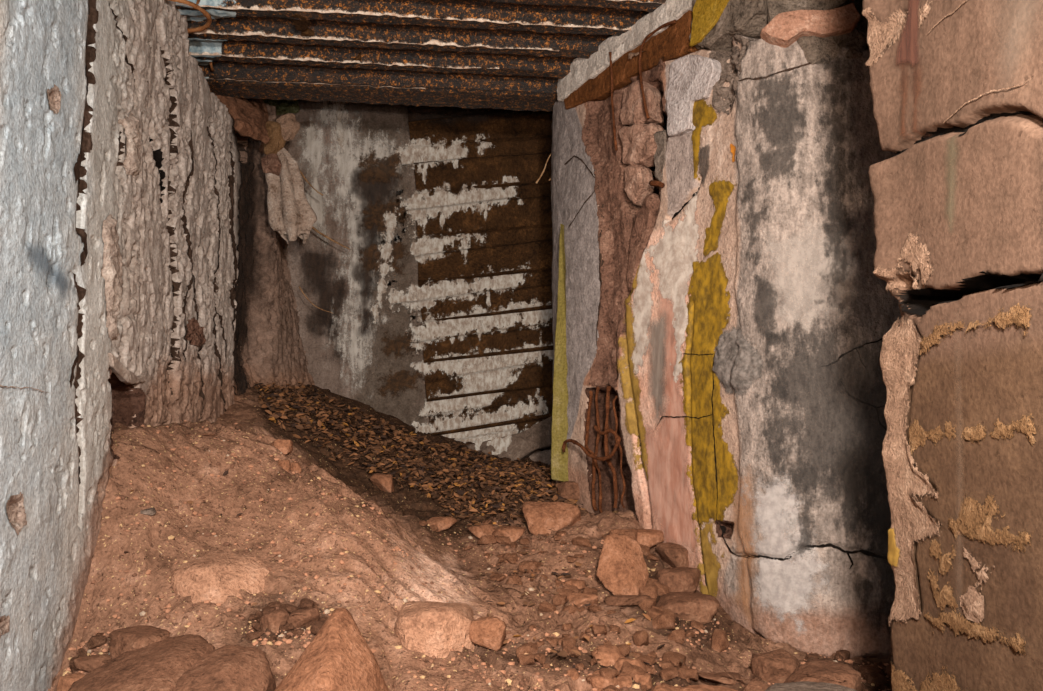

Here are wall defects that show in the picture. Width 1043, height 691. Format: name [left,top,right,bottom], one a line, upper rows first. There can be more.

spalling [185,317,206,346]
peeling [176,0,236,21]
rust [291,13,315,42]
water stain [298,101,553,455]
spalling [581,82,648,517]
crack [637,353,877,587]
water stain [741,180,819,553]
water stain [816,59,856,313]
water stain [837,450,896,630]
spalling [879,303,1039,657]
crack [891,111,1037,158]
crack [895,271,1043,317]